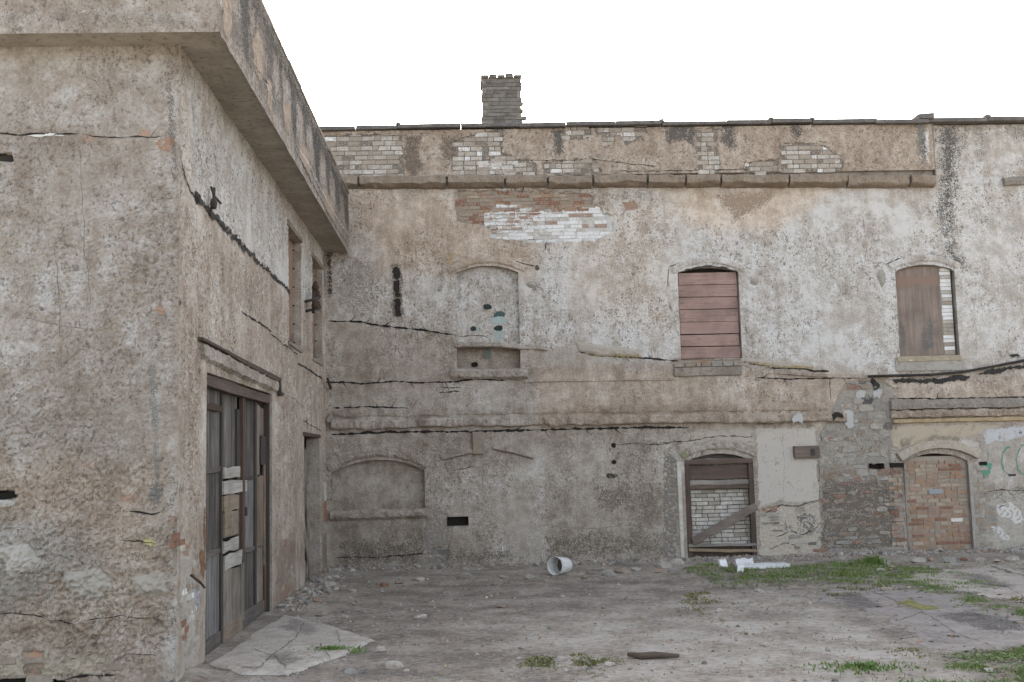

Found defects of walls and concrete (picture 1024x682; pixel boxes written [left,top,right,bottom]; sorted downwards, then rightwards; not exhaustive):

crack [0,124,164,299]
flaking render [324,132,405,178]
flaking render [451,129,615,243]
flaking render [744,142,845,175]
leakage [895,124,1024,271]
crack [241,311,753,446]
flaking render [759,379,1024,562]